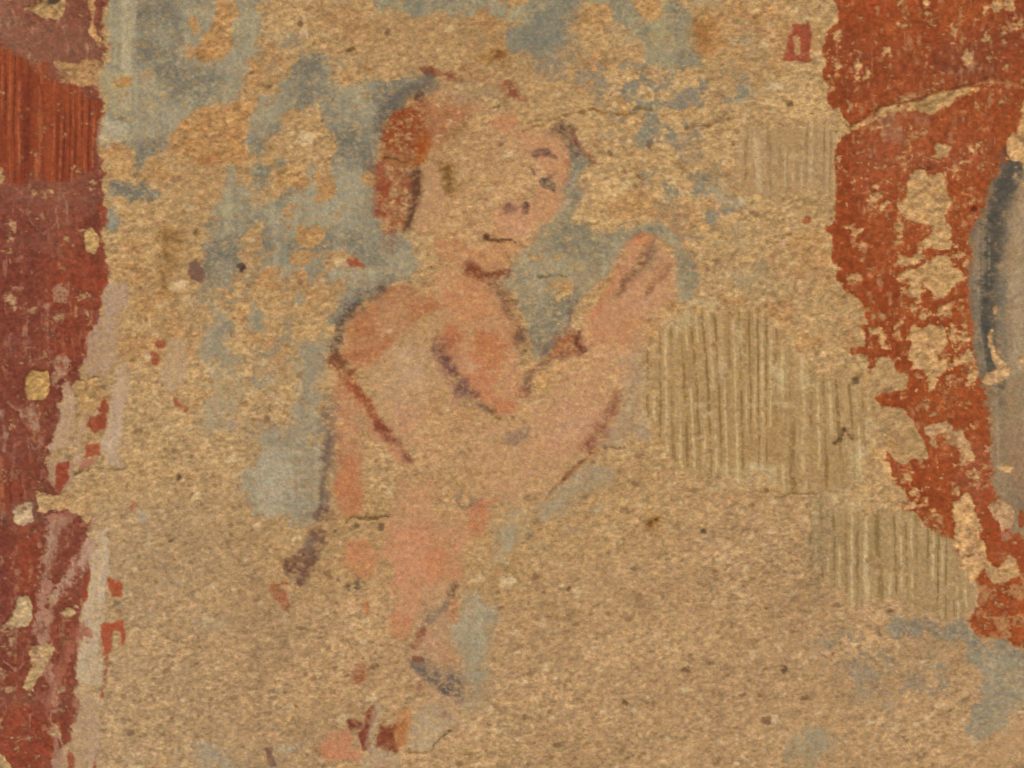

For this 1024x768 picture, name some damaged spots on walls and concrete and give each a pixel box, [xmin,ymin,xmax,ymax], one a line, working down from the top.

spalling [4,0,67,21]
peeling [920,0,1024,71]
crack [809,78,1024,135]
peeling [935,99,1024,185]
peeling [1,217,40,254]
peeling [844,224,867,251]
peeling [3,287,67,337]
peeling [72,289,107,327]
spalling [7,347,58,402]
spalling [0,585,33,656]
spalling [61,585,92,623]
peeling [24,643,55,699]